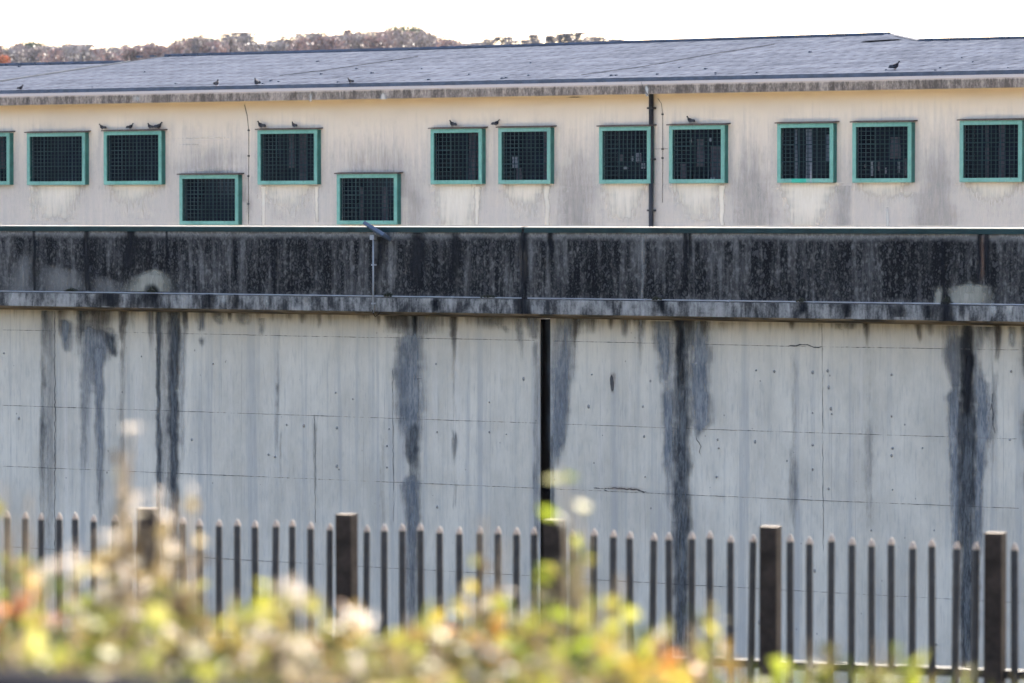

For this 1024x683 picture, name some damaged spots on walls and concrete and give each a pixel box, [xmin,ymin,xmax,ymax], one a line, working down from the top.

damp [10,185,114,292]
damp [375,237,385,274]
damp [433,184,480,279]
damp [519,228,528,299]
damp [42,311,127,496]
damp [148,312,247,544]
damp [377,316,436,597]
damp [550,318,595,510]
crack [596,485,644,493]
damp [609,319,711,656]
crack [789,344,823,475]
damp [946,325,1024,683]